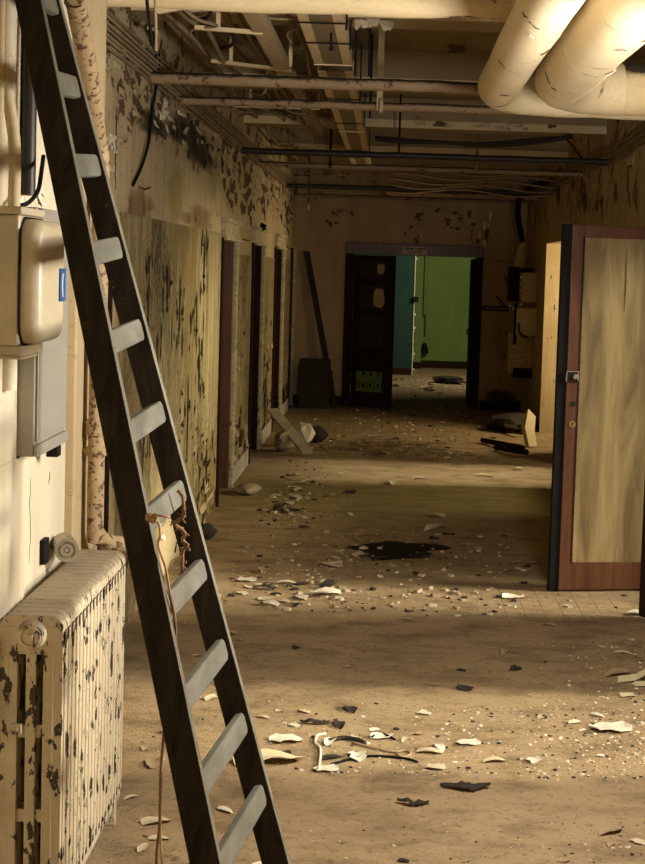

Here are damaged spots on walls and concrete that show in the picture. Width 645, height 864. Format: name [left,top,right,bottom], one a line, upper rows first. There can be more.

peeling [106,42,296,227]
peeling [200,480,216,524]